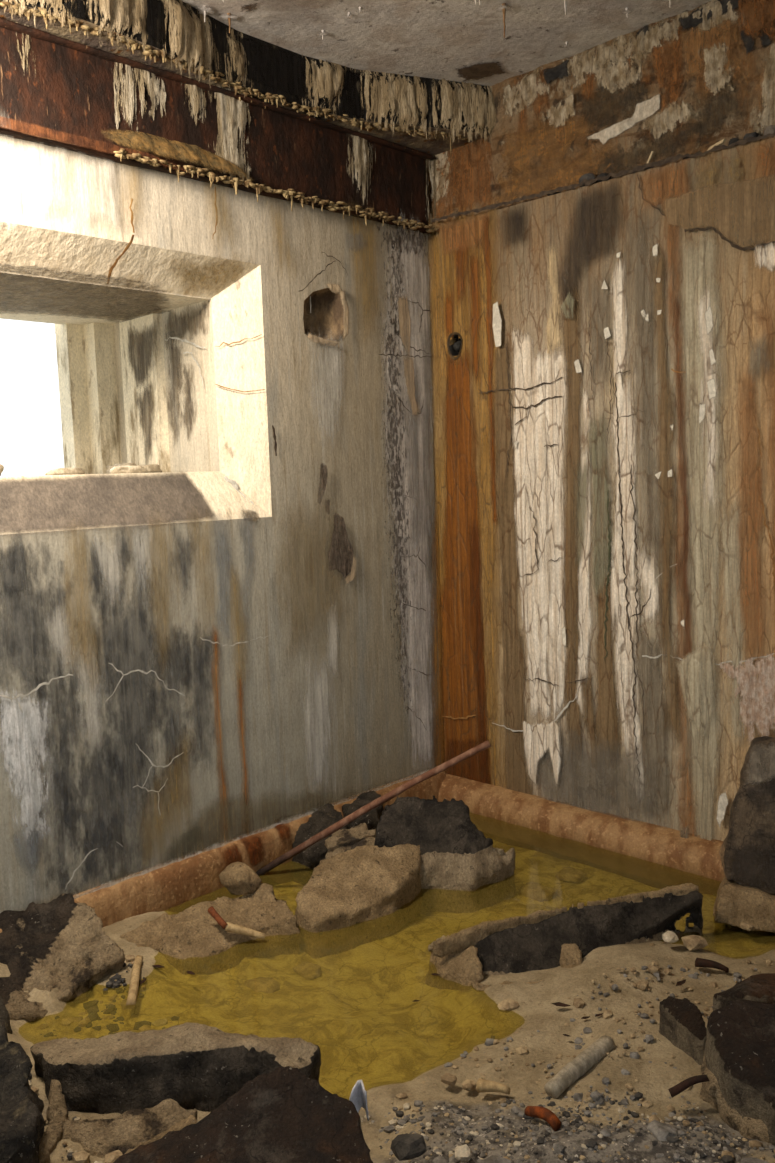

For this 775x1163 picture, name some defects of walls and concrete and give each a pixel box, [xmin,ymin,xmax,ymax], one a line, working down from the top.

rust [0,117,185,171]
crack [107,198,135,284]
crack [431,132,775,251]
peeling [587,94,660,144]
spalling [303,284,349,346]
damp [0,0,775,841]
crack [479,343,563,474]
peeling [318,463,357,584]
rust [440,217,498,784]
crack [519,315,684,777]
damp [0,526,358,899]
damp [730,842,775,891]